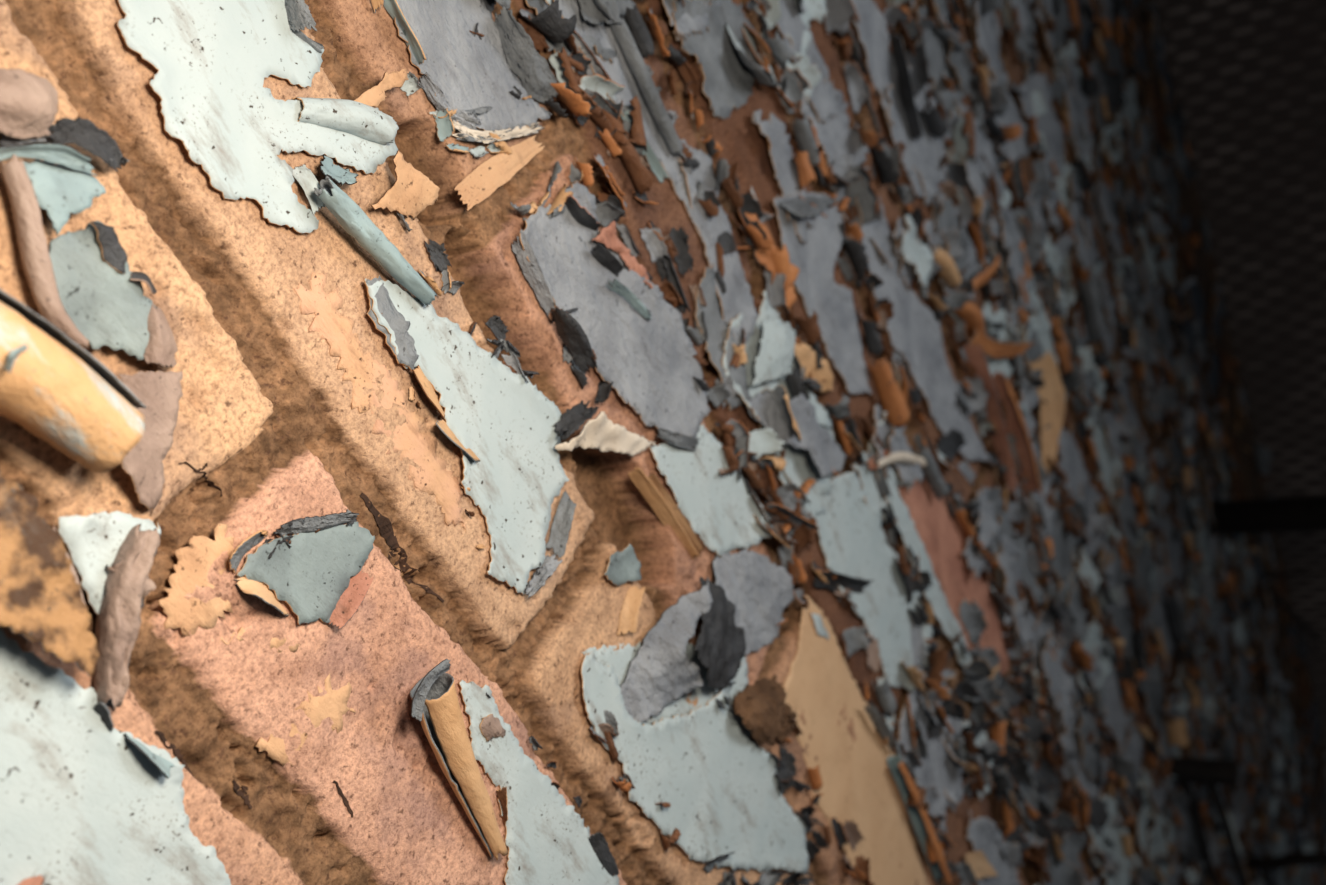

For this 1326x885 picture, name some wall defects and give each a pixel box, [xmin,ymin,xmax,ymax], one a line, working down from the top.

peeling [0,68,375,885]
peeling [117,0,1090,885]
peeling [914,0,1295,885]